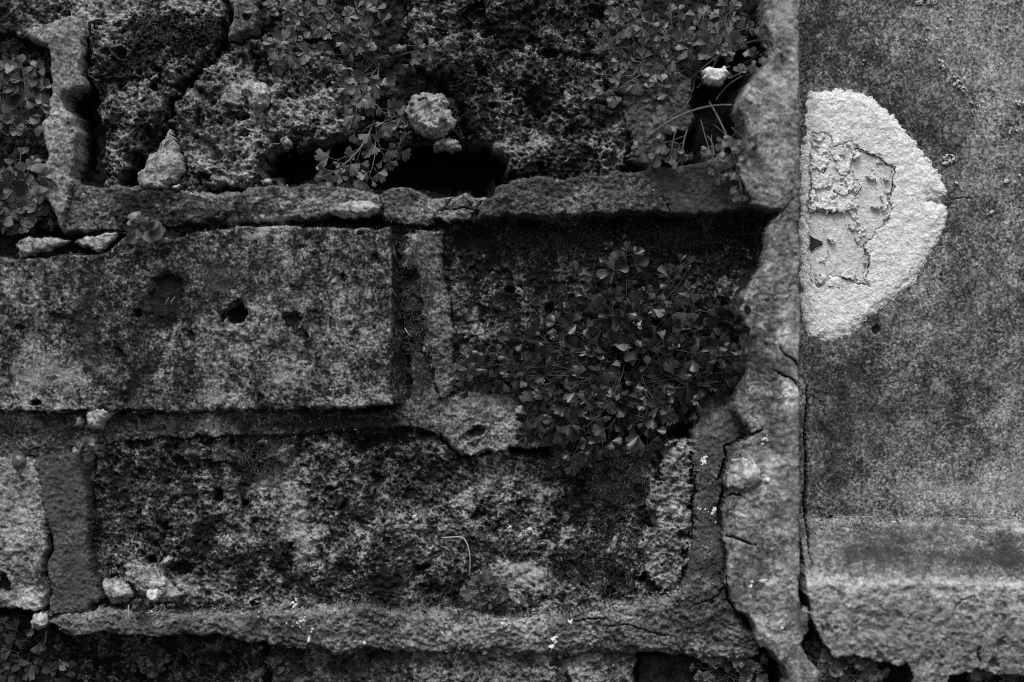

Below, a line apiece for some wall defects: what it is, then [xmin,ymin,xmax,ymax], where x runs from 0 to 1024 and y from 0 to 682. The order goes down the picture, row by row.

peeling [799,88,948,342]
crack [690,430,761,612]
crack [771,351,813,567]